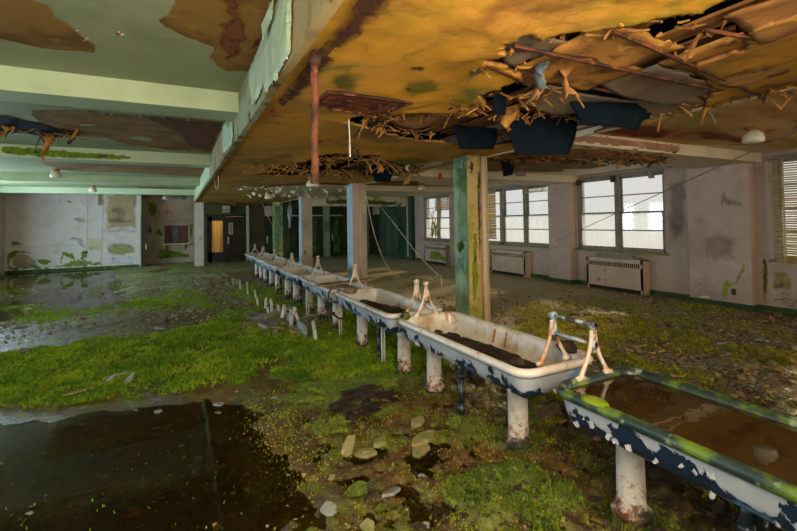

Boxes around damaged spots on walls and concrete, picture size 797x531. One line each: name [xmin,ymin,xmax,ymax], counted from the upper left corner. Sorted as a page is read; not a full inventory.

peeling [0,0,96,53]
peeling [156,0,292,107]
rust [270,0,389,111]
peeling [31,110,233,153]
peeling [487,90,797,172]
peeling [40,161,210,201]
leakage [98,194,136,227]
leakage [109,244,137,263]